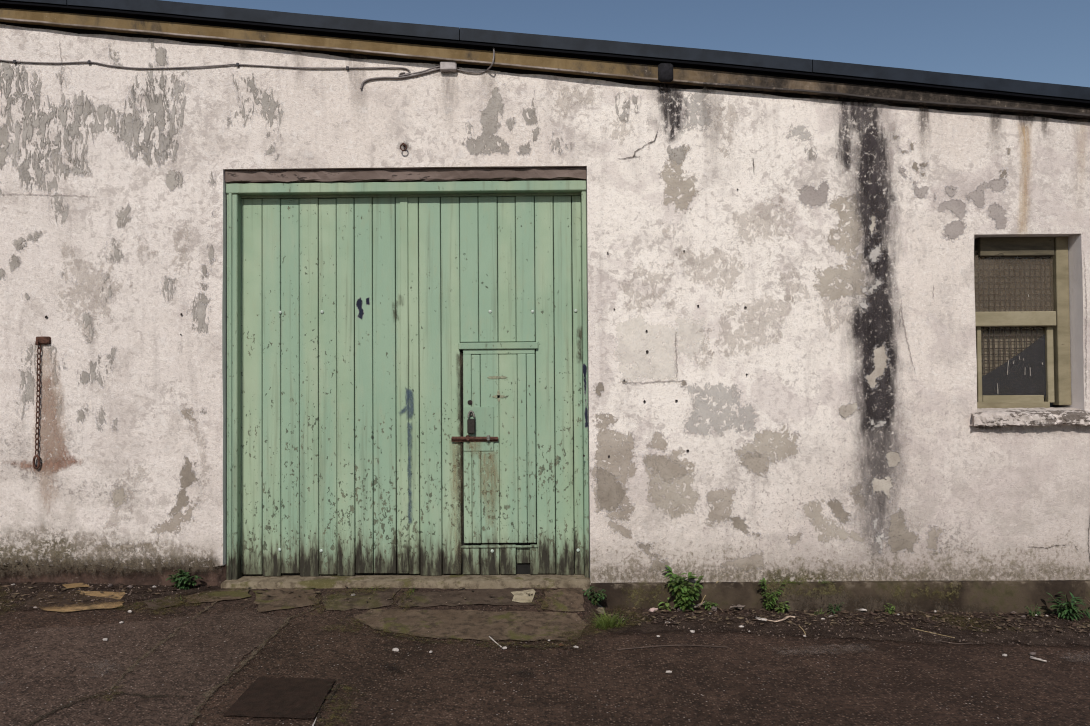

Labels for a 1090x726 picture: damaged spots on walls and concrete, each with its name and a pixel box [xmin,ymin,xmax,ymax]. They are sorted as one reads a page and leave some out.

peeling [0,39,189,222]
peeling [462,87,573,156]
water stain [659,83,682,140]
peeling [659,144,699,214]
peeling [893,135,1009,241]
peeling [0,230,42,279]
peeling [180,245,214,335]
water stain [811,96,896,518]
corrosion [14,378,77,474]
peeling [675,379,800,478]
peeling [583,413,765,574]
peeling [803,451,943,557]